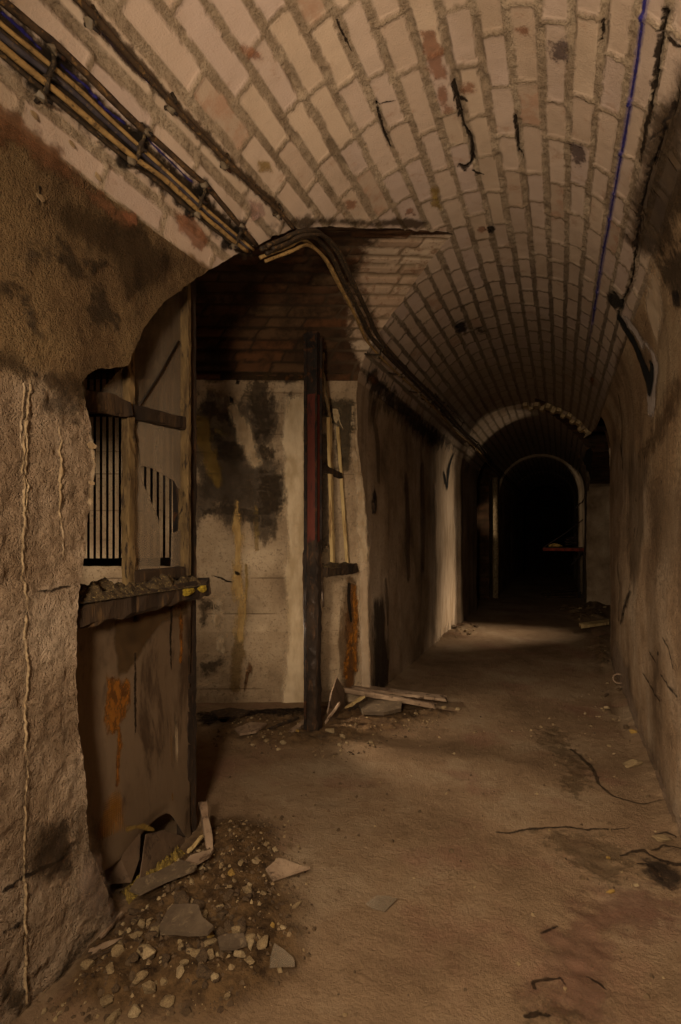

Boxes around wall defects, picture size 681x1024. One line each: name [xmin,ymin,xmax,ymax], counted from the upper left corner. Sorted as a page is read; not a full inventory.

crack [336,19,352,51]
crack [375,100,396,146]
crack [450,78,484,175]
crack [513,114,524,157]
crack [621,6,681,300]
water stain [624,75,681,340]
water stain [196,372,304,703]
rust [338,577,359,688]
rust [98,637,155,840]
crack [497,749,681,889]